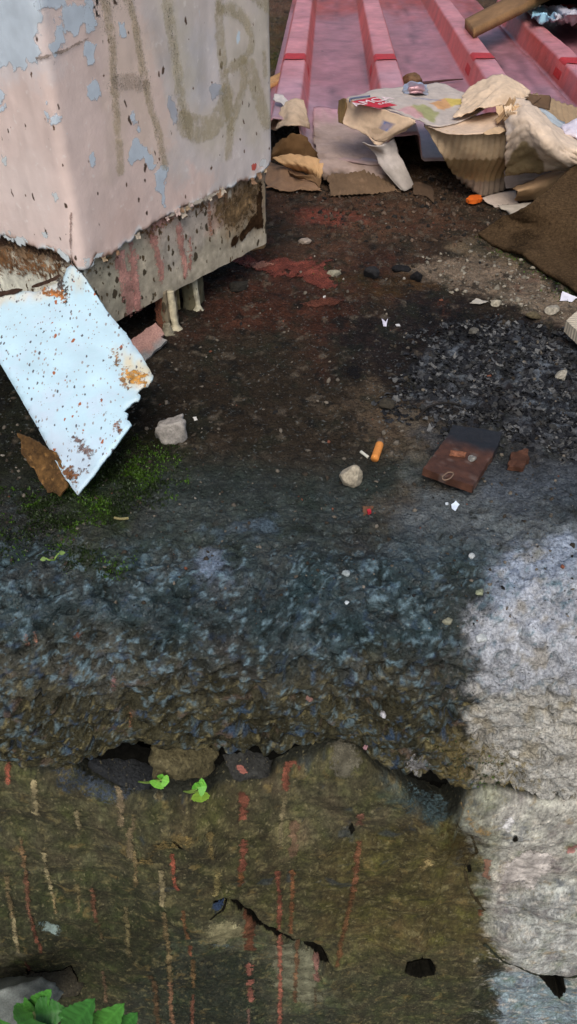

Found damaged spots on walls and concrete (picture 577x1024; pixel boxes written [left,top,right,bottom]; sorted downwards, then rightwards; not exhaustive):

peeling [0,0,98,72]
rust [112,348,148,389]
rust [61,435,94,488]
spalling [327,739,363,778]
spalling [398,754,452,825]
crack [209,898,329,962]